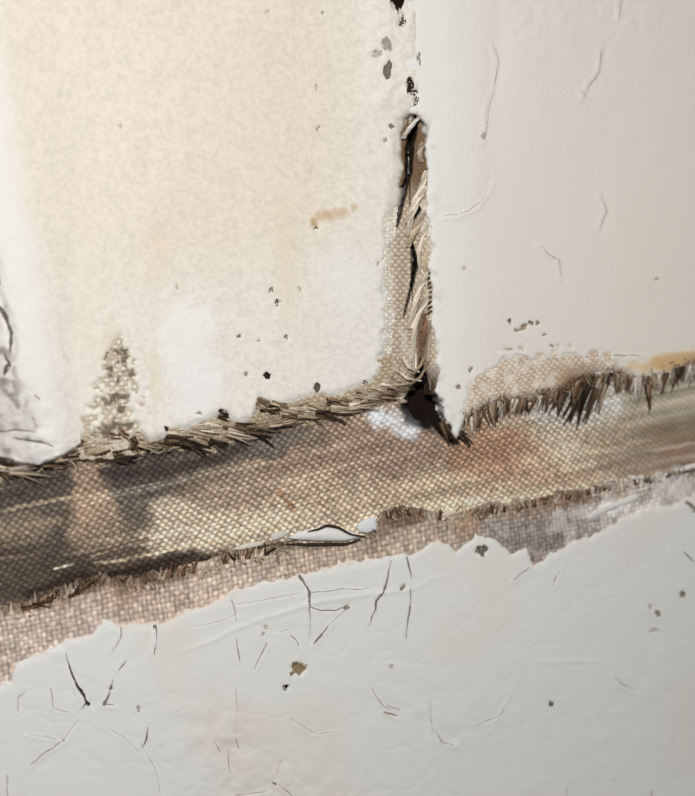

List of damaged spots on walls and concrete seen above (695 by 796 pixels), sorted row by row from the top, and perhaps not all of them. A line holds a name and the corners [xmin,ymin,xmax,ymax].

spalling [88,336,145,440]
peeling [234,516,378,550]
peeling [283,662,307,690]